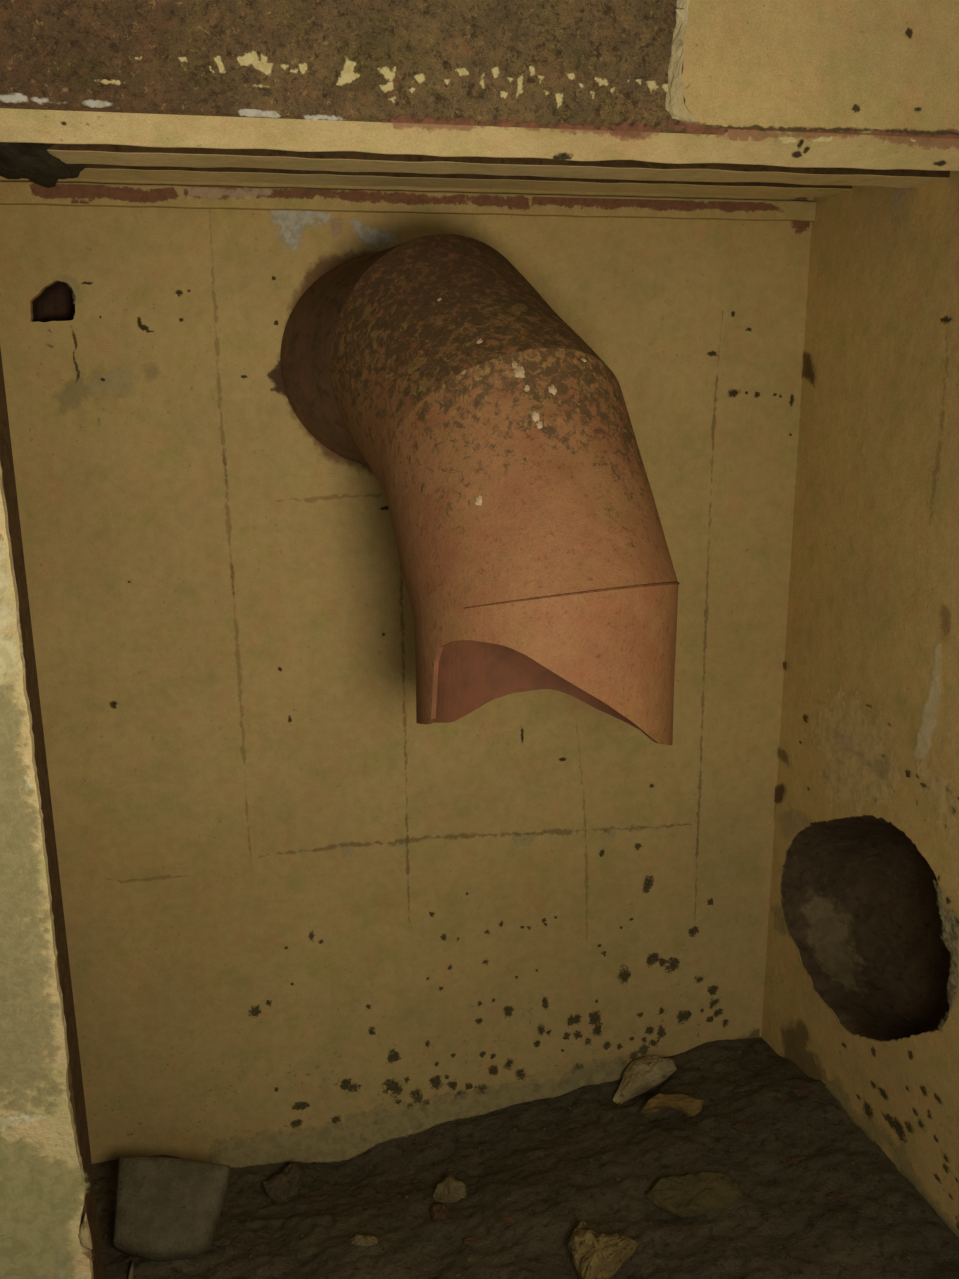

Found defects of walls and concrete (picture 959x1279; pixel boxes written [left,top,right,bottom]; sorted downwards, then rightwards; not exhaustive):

peeling [0,93,47,103]
peeling [209,51,307,88]
peeling [336,58,360,86]
peeling [378,0,959,166]
corrosion [292,253,373,309]
corrosion [268,361,294,411]
efflorescence [915,644,941,758]
mould [643,875,654,892]
mould [646,953,680,973]
spalling [934,875,959,1030]
leakage [212,977,729,1168]
leakage [825,1080,959,1238]